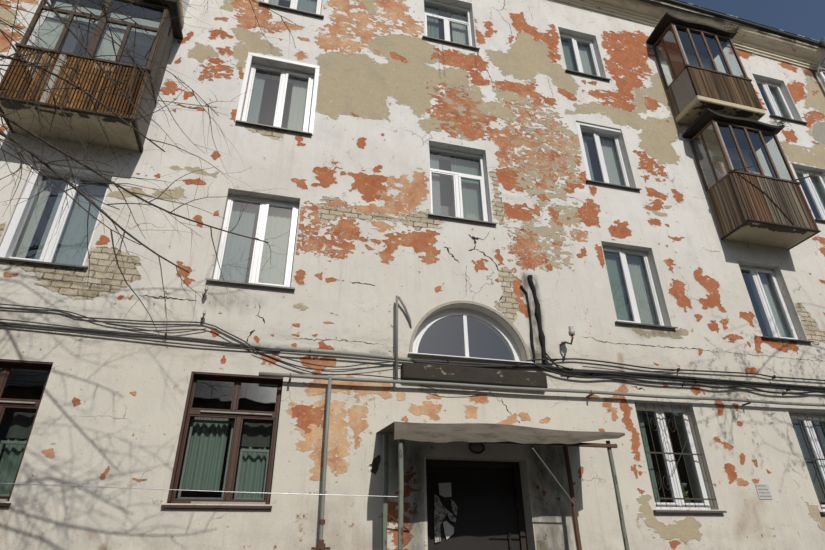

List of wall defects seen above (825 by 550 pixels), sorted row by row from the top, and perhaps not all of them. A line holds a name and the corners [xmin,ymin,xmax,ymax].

peeling [160,79,203,112]
spalling [774,61,825,169]
spalling [174,0,685,324]
flaking render [3,235,143,303]
crack [445,226,532,302]
peeling [631,258,800,356]
flaking render [794,302,825,345]
peeling [283,334,443,486]
peeling [465,392,490,418]
peeling [583,384,647,478]
peeling [376,461,427,550]
spalling [635,488,703,549]